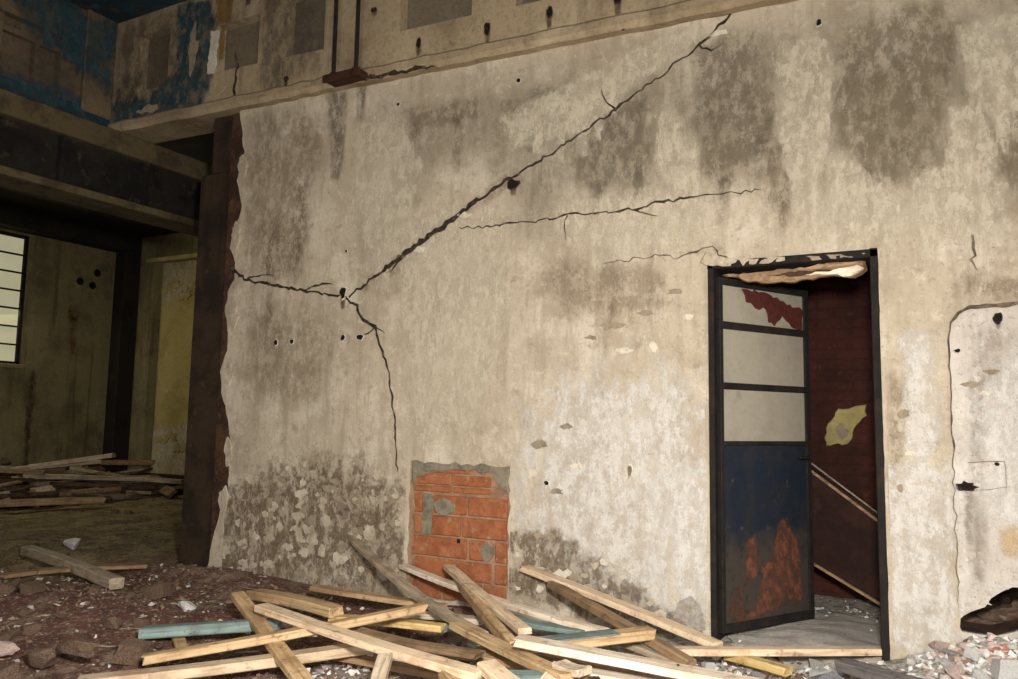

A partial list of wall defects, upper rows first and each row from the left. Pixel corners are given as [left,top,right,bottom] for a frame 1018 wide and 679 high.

peeling [111,1,225,122]
spalling [226,219,241,249]
spalling [230,146,248,179]
crack [230,13,760,472]
leakage [500,20,704,162]
leakage [558,111,704,272]
leakage [770,13,1018,266]
peeling [742,289,803,330]
peeling [825,405,867,446]
peeling [209,437,403,592]
rust [737,520,802,622]
spalling [960,578,1018,613]